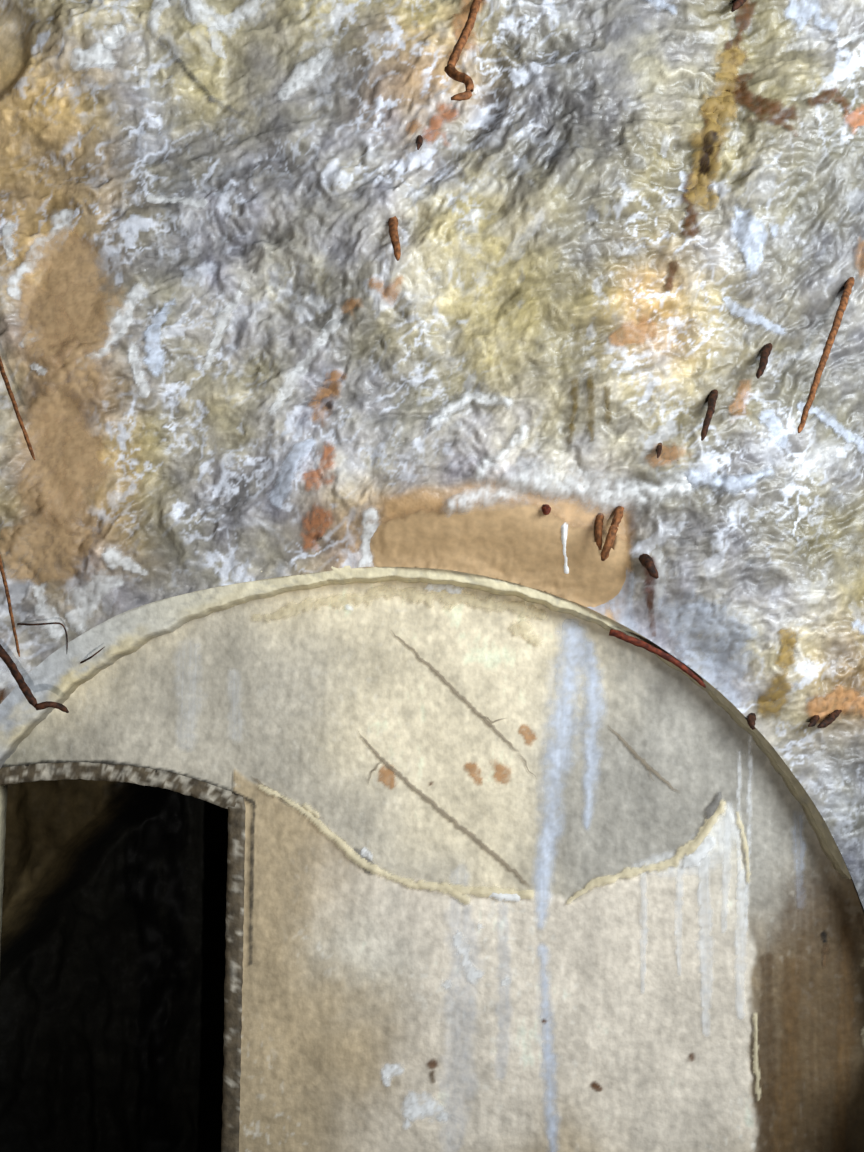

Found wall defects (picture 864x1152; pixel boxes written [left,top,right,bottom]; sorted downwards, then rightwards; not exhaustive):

corrosion [0,229,120,582]
corrosion [646,569,655,636]
peeling [259,785,534,904]
crack [361,737,526,884]
crack [394,635,533,774]
corrosion [465,763,507,783]
damp [537,620,604,927]
peeling [567,792,751,904]
damp [539,946,557,1152]
peeling [753,1013,761,1101]